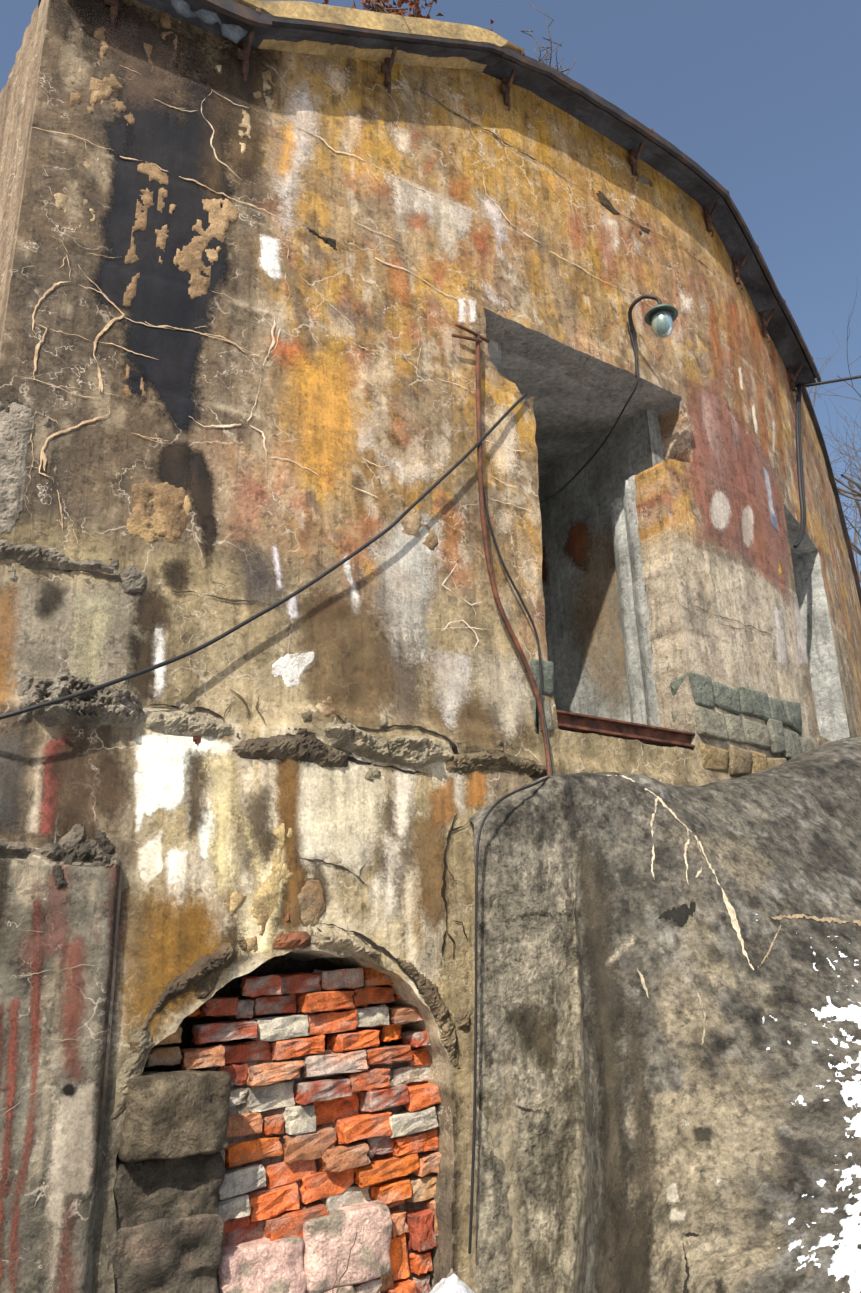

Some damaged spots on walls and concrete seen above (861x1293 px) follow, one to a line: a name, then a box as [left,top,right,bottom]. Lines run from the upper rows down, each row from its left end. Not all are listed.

flaking render [69,65,135,126]
flaking render [238,110,251,154]
flaking render [123,163,239,307]
damp [51,0,319,563]
crack [21,65,458,580]
spalling [0,398,147,594]
spalling [16,670,144,729]
damp [127,558,190,706]
spalling [232,696,352,768]
spalling [0,824,120,890]
crack [607,774,861,970]
spalling [111,821,470,1119]